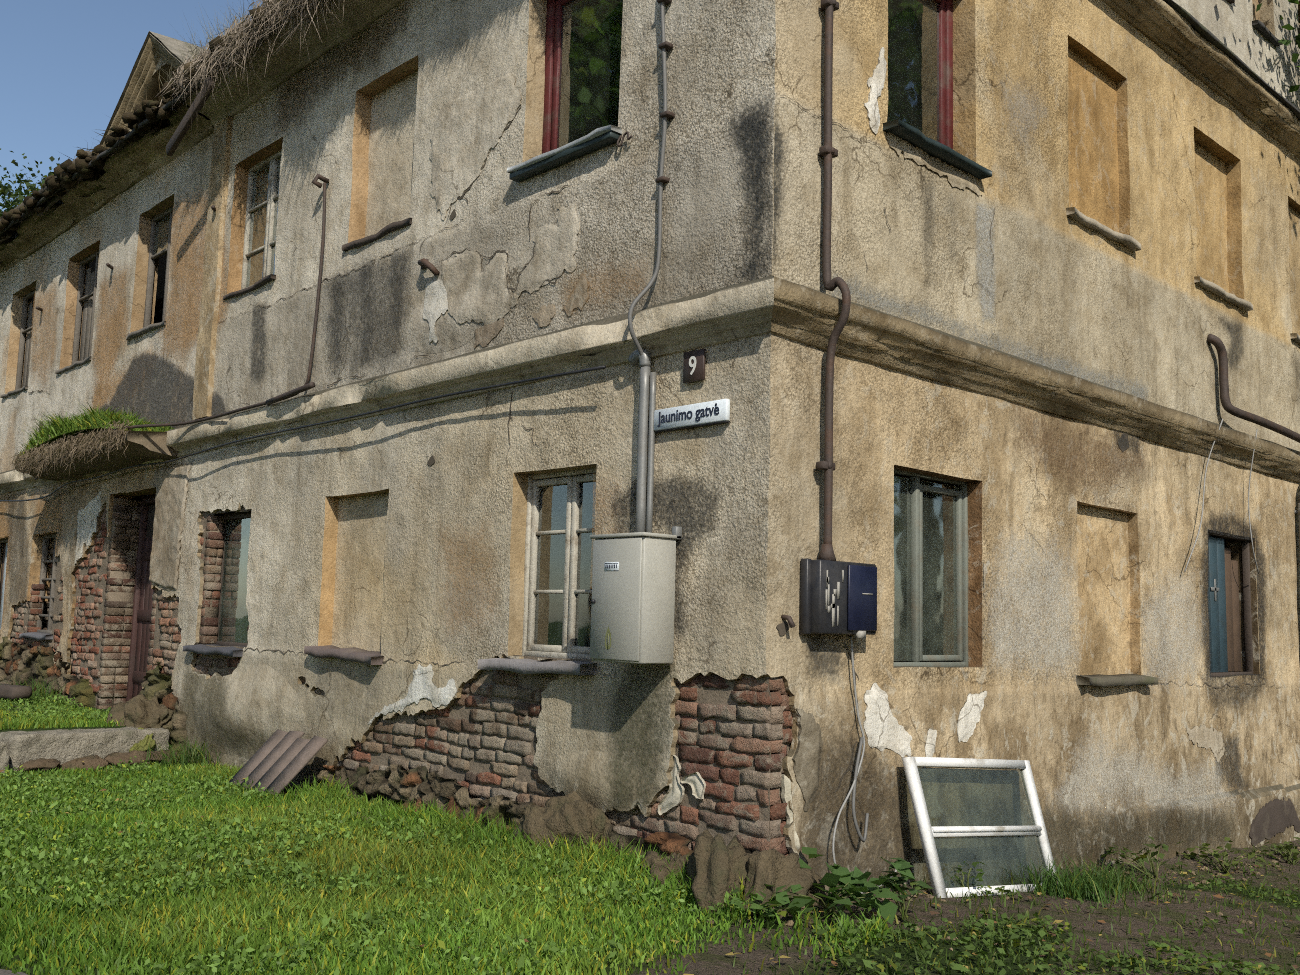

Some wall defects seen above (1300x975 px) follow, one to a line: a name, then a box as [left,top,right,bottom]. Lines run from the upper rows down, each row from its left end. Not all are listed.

crack [169,107,575,342]
peeling [423,203,580,349]
leakage [731,102,783,278]
peeling [864,47,982,196]
spalling [10,491,115,708]
peeling [149,462,252,689]
spalling [337,655,592,807]
spalling [605,673,823,856]
peeling [863,683,937,758]
peeling [957,691,987,743]
leakage [966,803,1229,869]
leakage [1063,739,1242,802]